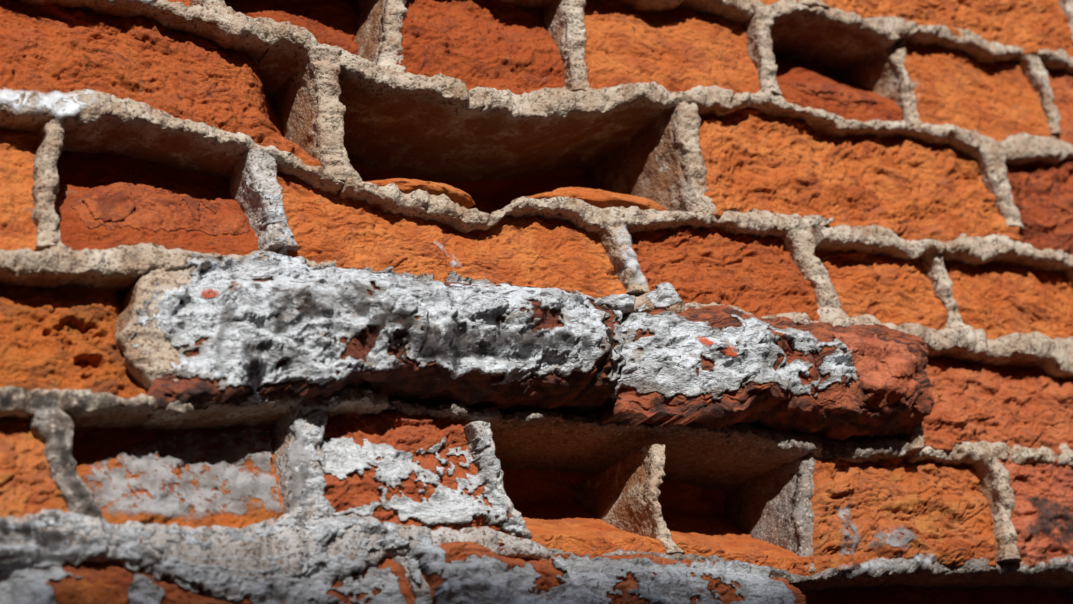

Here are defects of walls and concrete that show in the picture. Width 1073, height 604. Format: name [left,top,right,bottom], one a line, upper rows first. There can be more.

spalling [780,82,885,108]
peeling [0,174,920,604]